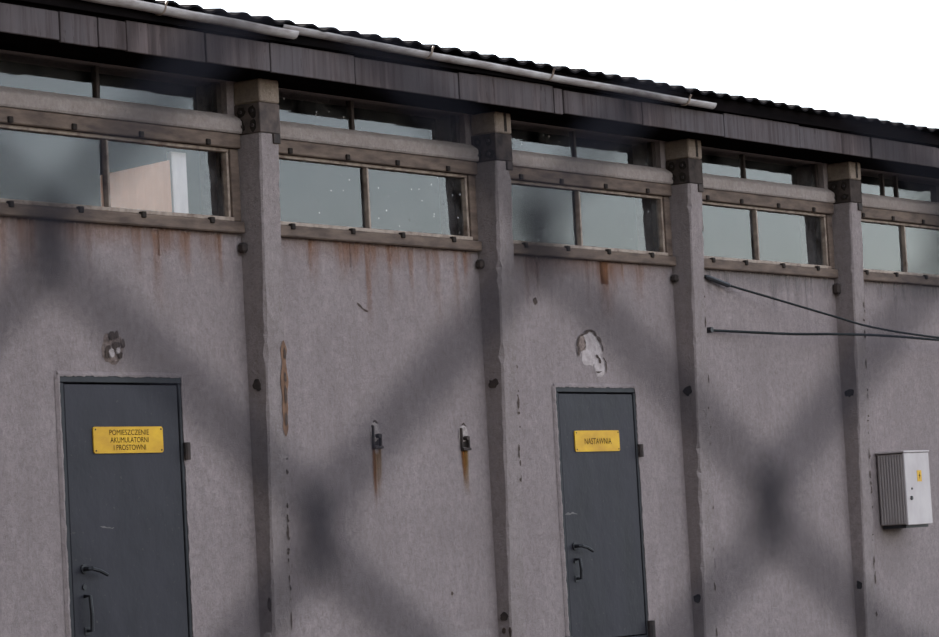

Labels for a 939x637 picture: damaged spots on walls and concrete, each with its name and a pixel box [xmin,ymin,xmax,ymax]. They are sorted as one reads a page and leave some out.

spalling [101,332,125,365]
peeling [577,329,607,377]